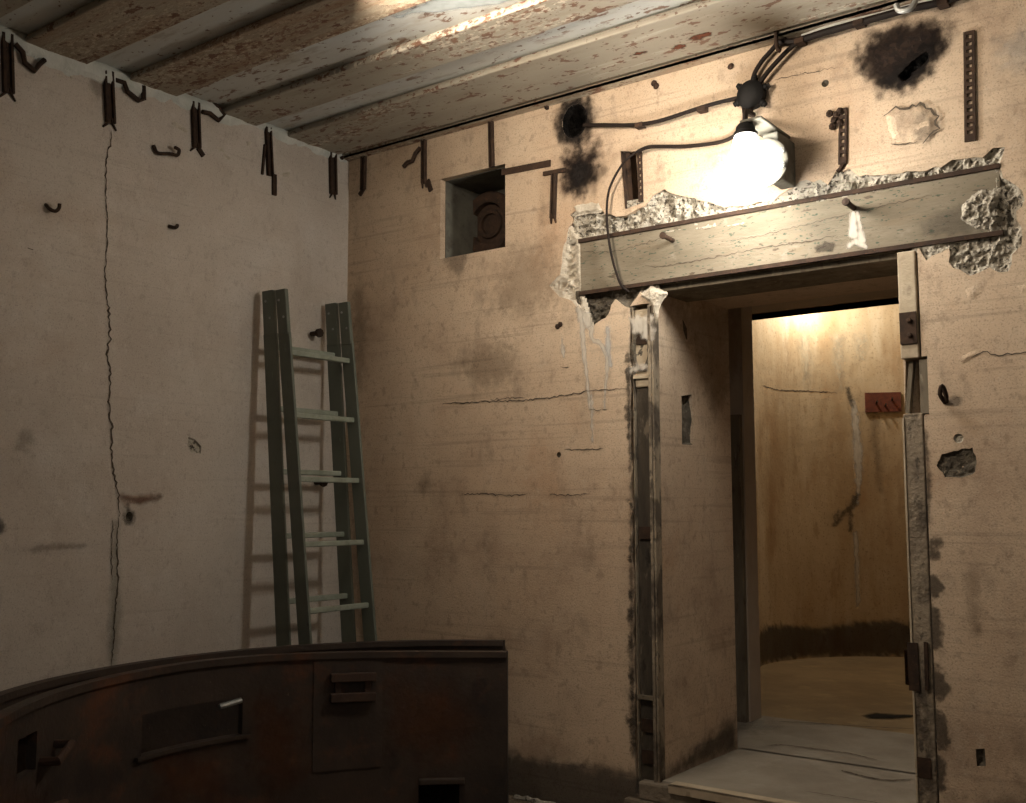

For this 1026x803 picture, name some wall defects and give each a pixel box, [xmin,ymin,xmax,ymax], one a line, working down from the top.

spalling [549,147,1024,326]
crack [104,133,121,664]
efflorescence [576,306,612,441]
crack [961,351,1026,362]
spalling [924,433,977,507]
spalling [929,575,944,649]
spalling [932,664,950,791]